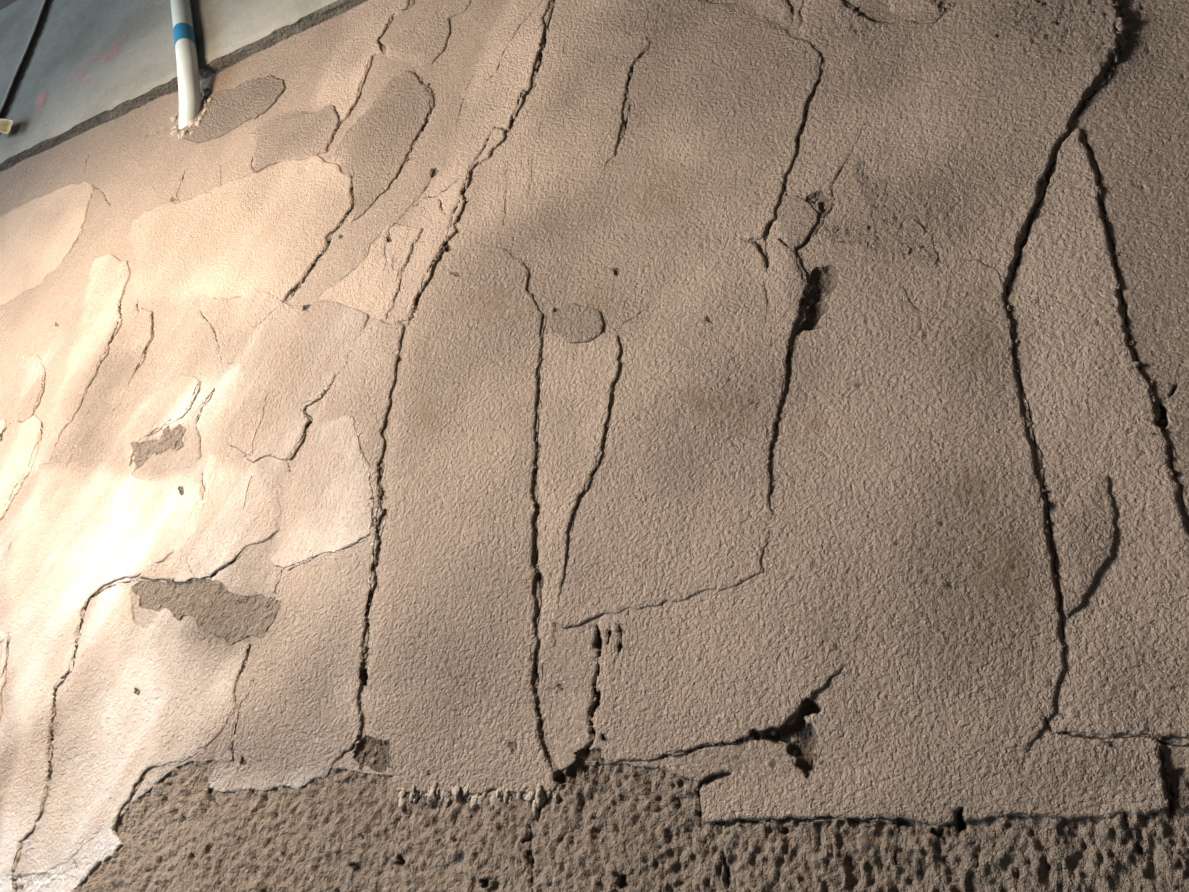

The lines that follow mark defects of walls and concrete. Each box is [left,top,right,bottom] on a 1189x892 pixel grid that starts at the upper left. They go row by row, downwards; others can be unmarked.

crack [255,0,565,327]
crack [1074,48,1141,370]
crack [740,122,866,497]
crack [48,580,135,779]
flaking render [131,424,186,469]
flaking render [131,577,280,645]
crack [274,416,387,658]
flaking render [352,735,391,773]
crack [529,316,623,771]
flaking render [554,734,608,790]
flaking render [750,698,822,779]
spalling [957,809,966,832]